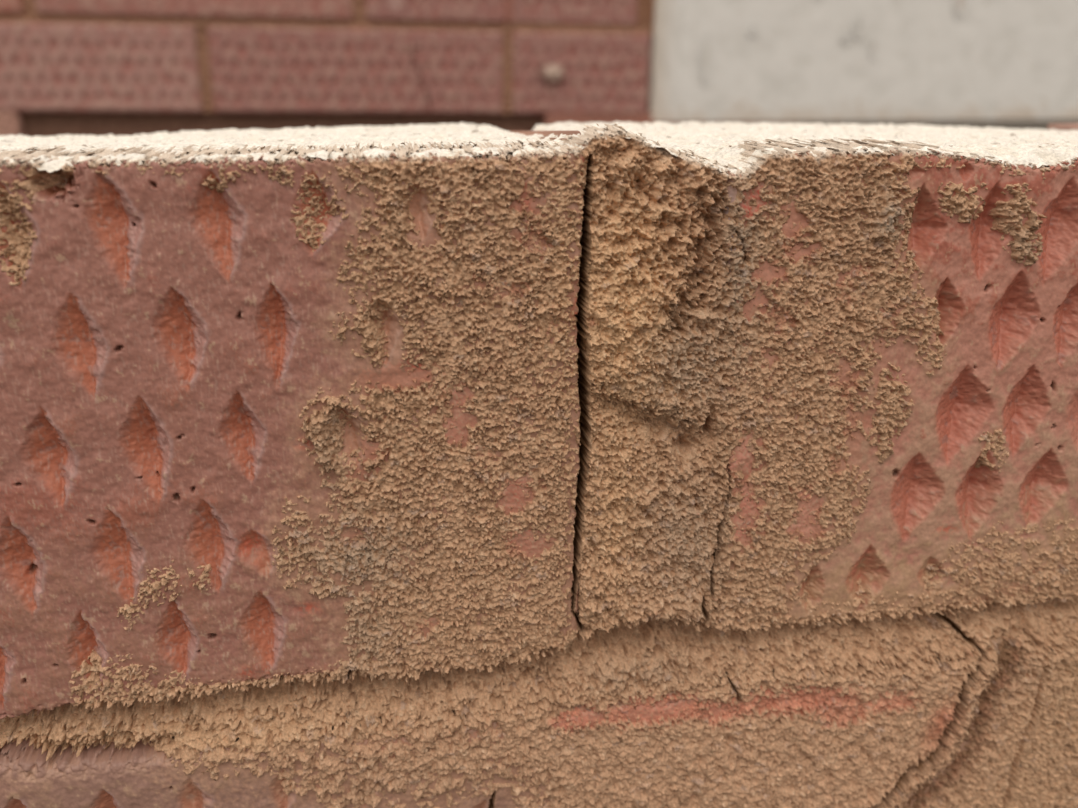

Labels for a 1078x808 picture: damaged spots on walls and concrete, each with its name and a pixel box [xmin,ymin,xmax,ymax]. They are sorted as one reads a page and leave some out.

crack [570,154,594,637]
crack [700,464,732,628]
crack [869,609,990,808]